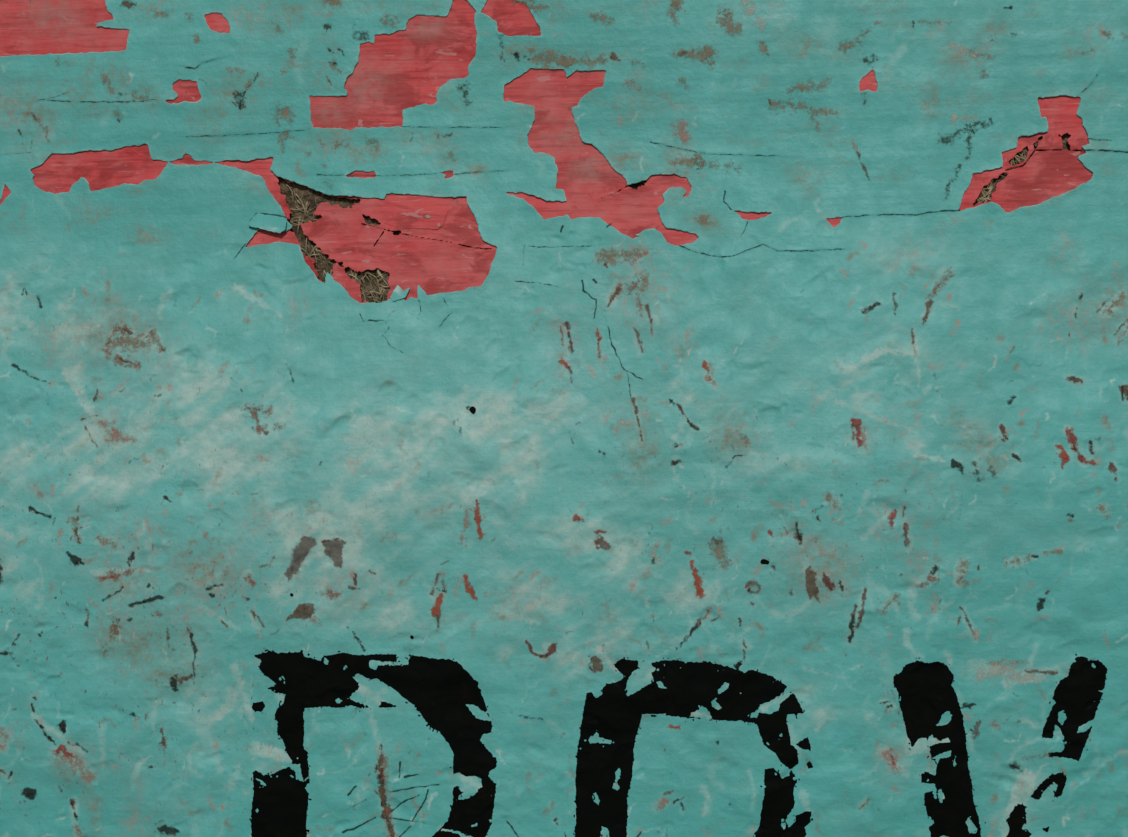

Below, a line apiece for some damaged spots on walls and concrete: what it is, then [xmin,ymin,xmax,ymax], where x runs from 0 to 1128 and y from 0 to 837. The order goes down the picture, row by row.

peeling [0,0,129,56]
peeling [309,0,541,130]
peeling [31,144,497,303]
peeling [503,68,698,246]
crack [679,190,841,257]
crack [833,210,960,219]
peeling [959,96,1093,212]
crack [1080,138,1128,153]